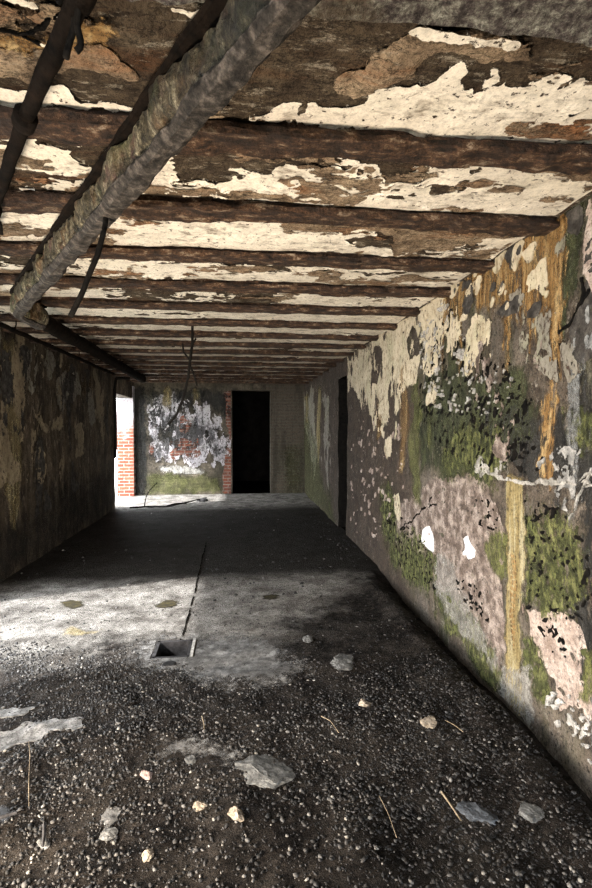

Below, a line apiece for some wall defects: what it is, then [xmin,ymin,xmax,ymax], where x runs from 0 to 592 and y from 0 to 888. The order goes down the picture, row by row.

rust [0,29,48,57]
rust [71,16,122,57]
peeling [408,25,521,52]
peeling [0,88,27,107]
peeling [42,85,133,112]
peeling [242,61,592,144]
peeling [9,139,92,192]
peeling [0,154,592,676]
water stain [0,466,113,584]
mould [382,498,436,591]
water stain [416,302,592,704]
water stain [500,666,534,729]